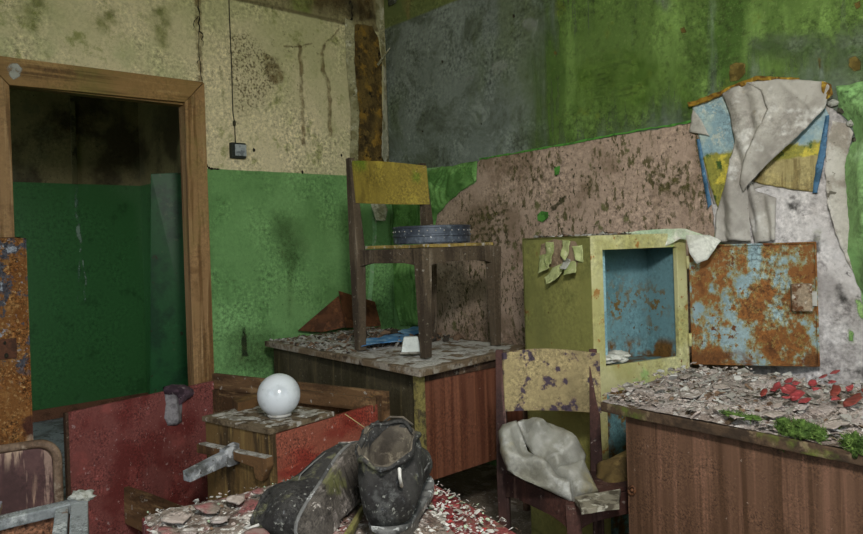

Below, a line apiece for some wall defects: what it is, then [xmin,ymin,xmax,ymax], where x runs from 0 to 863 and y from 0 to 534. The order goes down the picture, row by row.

crack [193,0,204,79]
flaking render [345,0,397,162]
flaking render [827,107,847,143]
peeling [435,120,863,388]